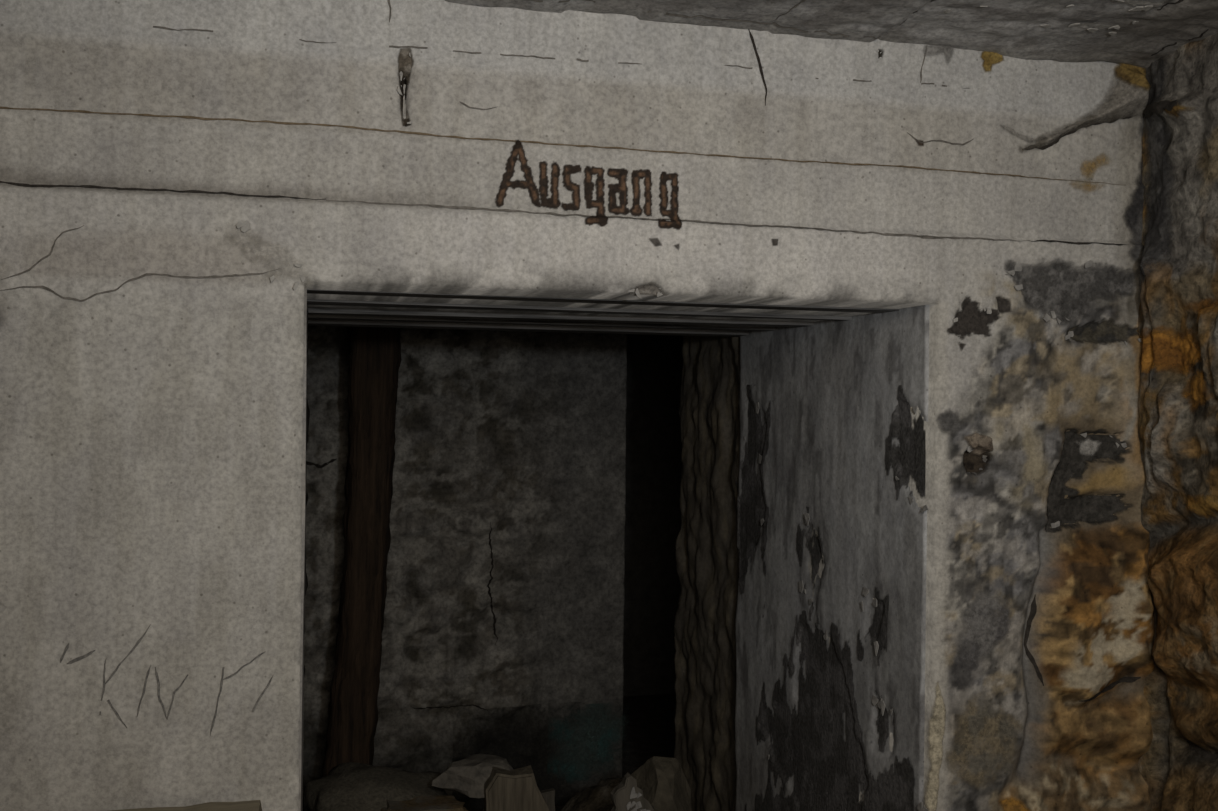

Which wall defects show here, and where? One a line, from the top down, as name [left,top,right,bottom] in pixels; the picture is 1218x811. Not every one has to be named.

crack [153,25,213,33]
crack [388,0,589,62]
crack [648,0,935,106]
crack [1,225,278,302]
peeling [947,260,1142,349]
peeling [736,384,771,594]
peeling [885,385,928,513]
peeling [1045,429,1131,532]
peeling [745,506,946,811]